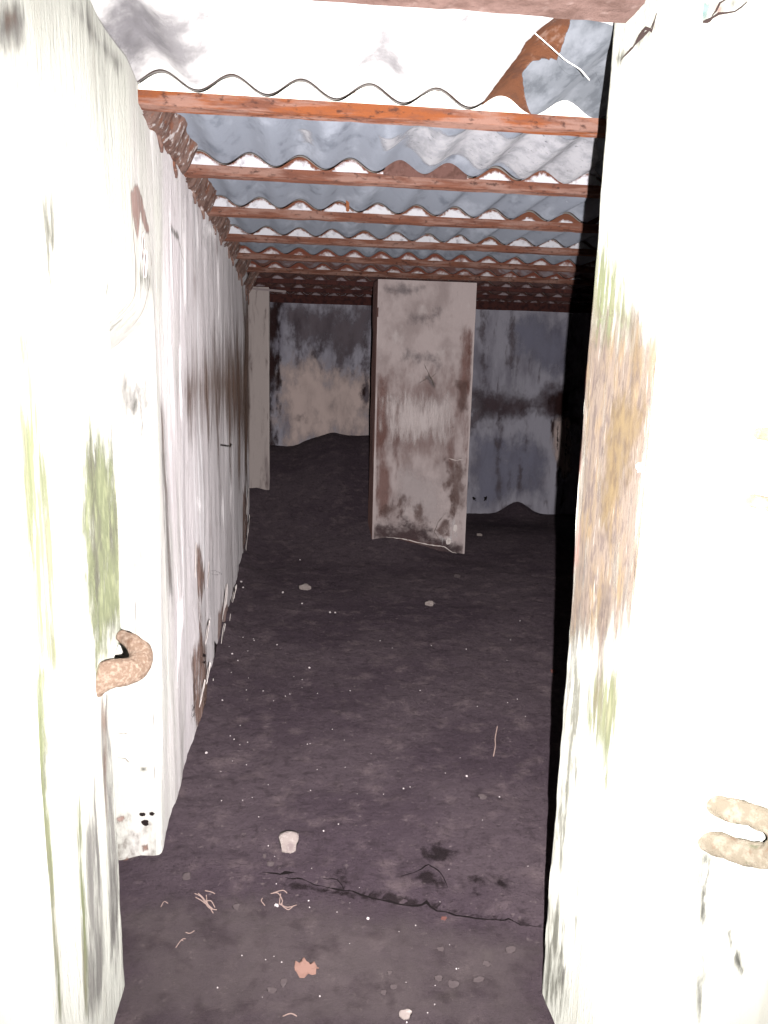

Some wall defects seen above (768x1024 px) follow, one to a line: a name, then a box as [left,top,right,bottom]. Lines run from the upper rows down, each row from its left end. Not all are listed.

peeling [481,18,614,118]
leakage [269,302,373,445]
leakage [380,394,448,440]
leakage [376,472,461,553]
leakage [447,458,462,514]
leakage [470,240,659,790]
leakage [90,555,100,676]